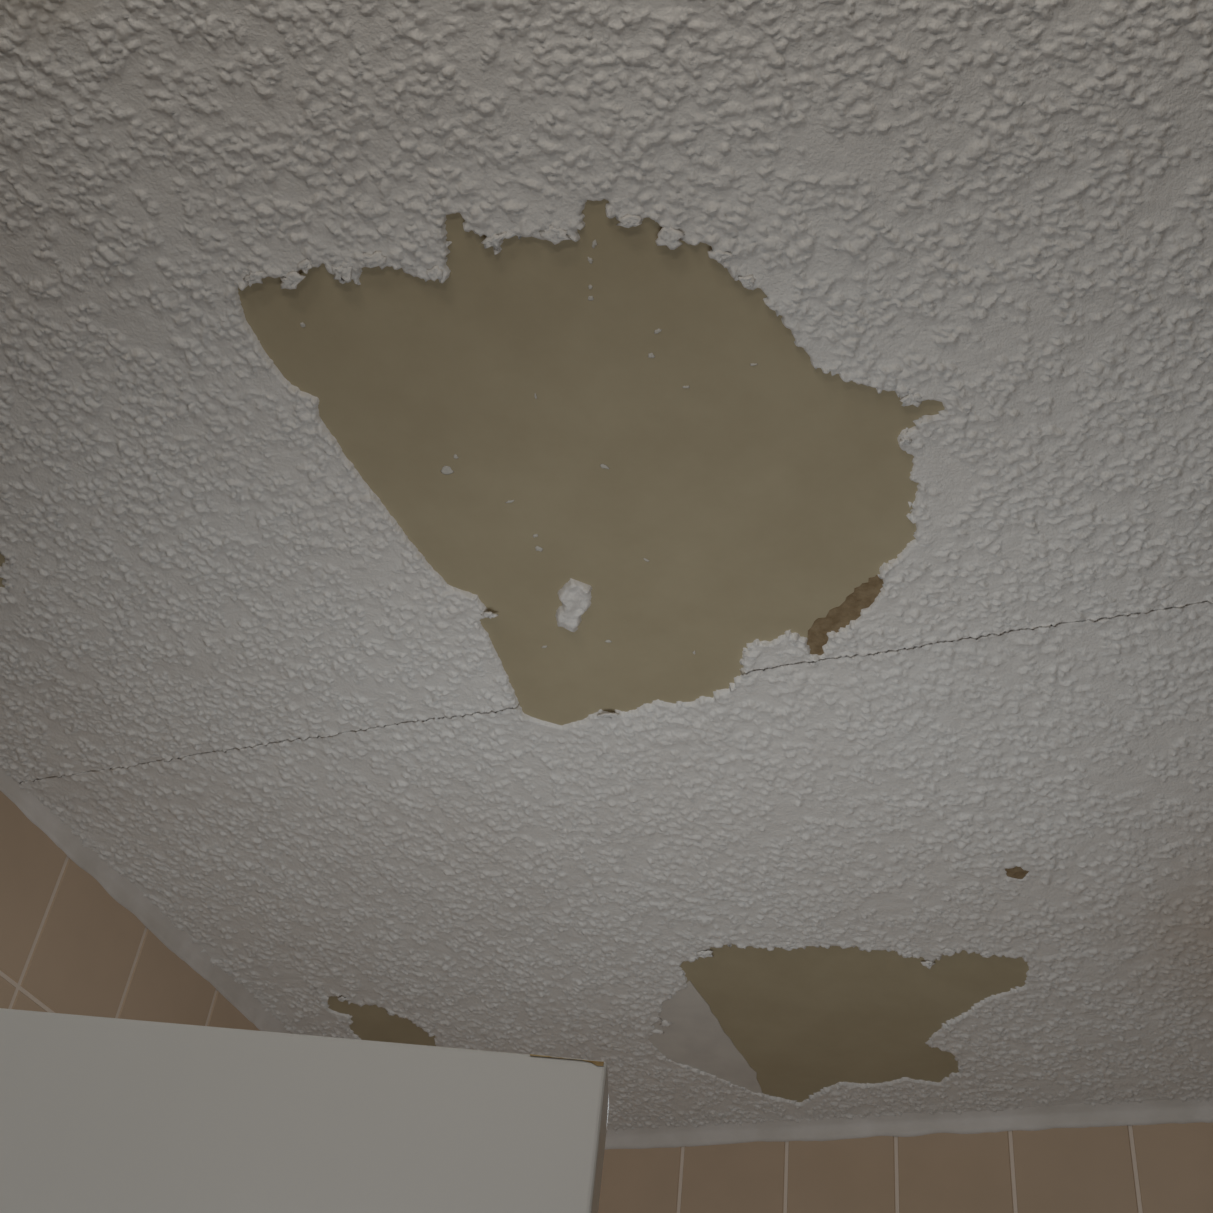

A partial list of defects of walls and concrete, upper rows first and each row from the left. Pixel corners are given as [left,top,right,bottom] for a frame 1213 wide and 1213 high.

peeling [238,199,945,725]
peeling [318,995,436,1046]
peeling [648,942,1029,1102]